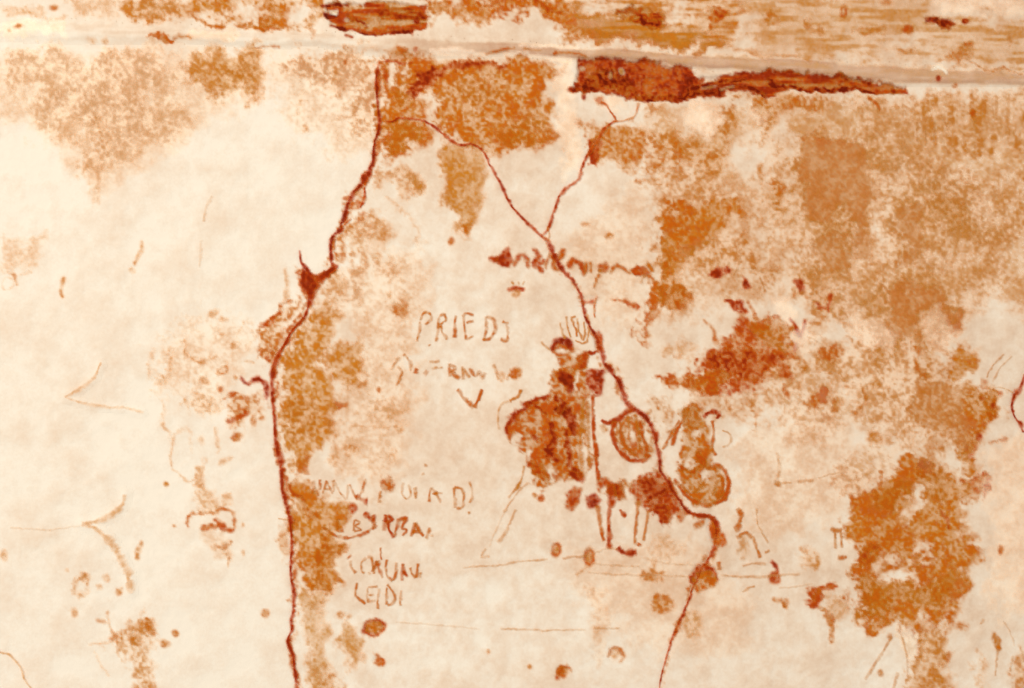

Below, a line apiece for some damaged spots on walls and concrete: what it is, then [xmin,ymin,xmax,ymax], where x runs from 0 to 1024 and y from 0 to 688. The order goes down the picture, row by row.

spalling [321,0,429,38]
rust [374,46,559,161]
spalling [521,44,908,110]
crack [270,63,726,688]
leakage [578,94,1024,688]